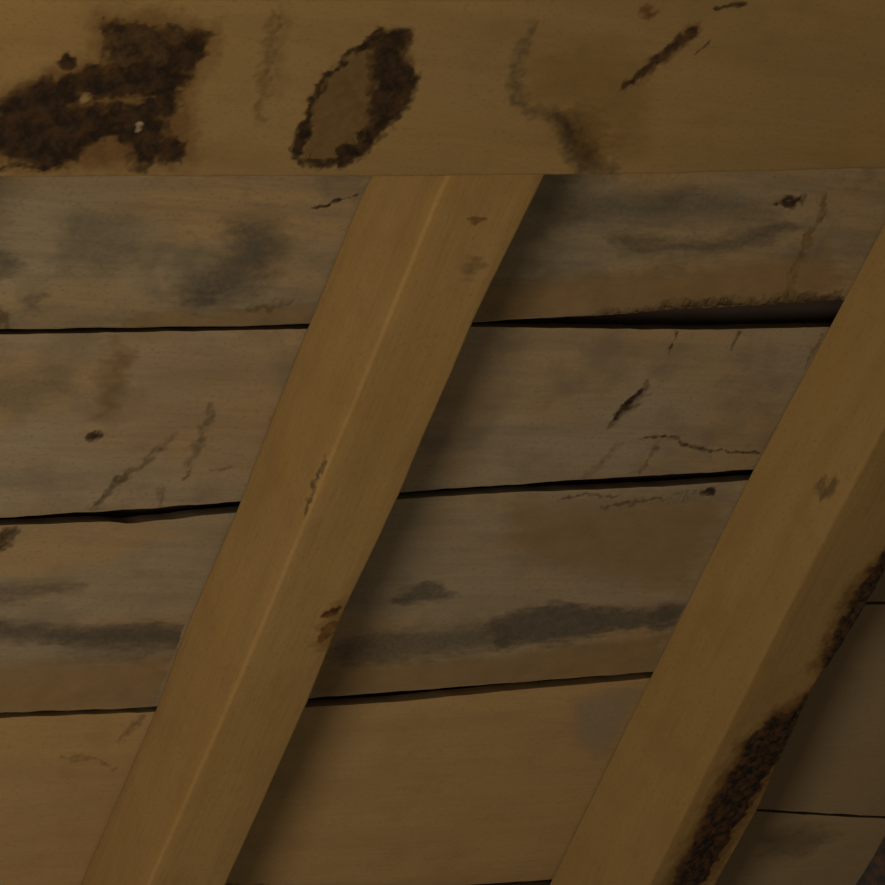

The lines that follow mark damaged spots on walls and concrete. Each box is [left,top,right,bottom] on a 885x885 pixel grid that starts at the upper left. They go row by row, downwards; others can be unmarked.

crack [610,389,643,424]
damp [493,604,681,647]